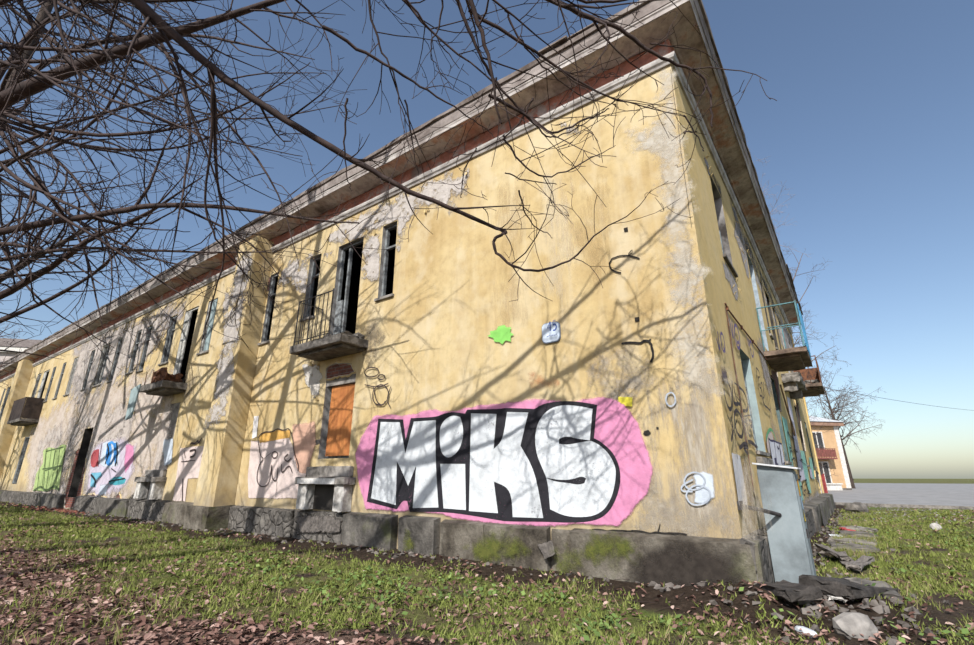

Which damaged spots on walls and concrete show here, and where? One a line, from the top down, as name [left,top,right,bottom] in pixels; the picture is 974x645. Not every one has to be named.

peeling [204,249,254,429]
flaking render [302,361,356,401]
peeling [267,168,469,294]
flaking render [723,202,784,348]